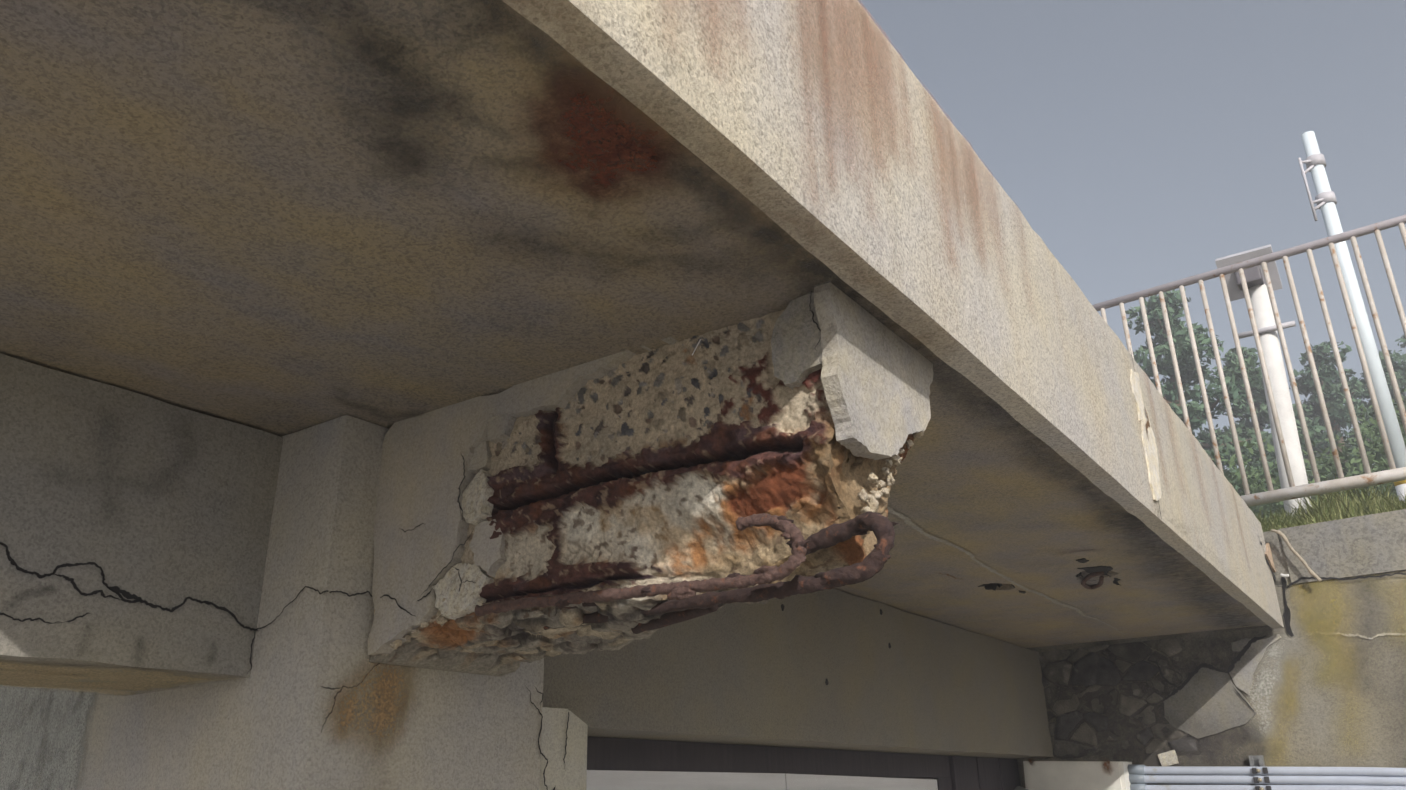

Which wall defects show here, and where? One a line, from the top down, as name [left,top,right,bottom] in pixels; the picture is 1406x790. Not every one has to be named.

rust [536,79,671,198]
water stain [661,142,860,301]
spalling [369,291,924,677]
crack [0,542,432,674]
spalling [1076,558,1122,590]
crack [1259,538,1406,639]
crack [525,685,569,790]
flaking render [1039,634,1281,766]